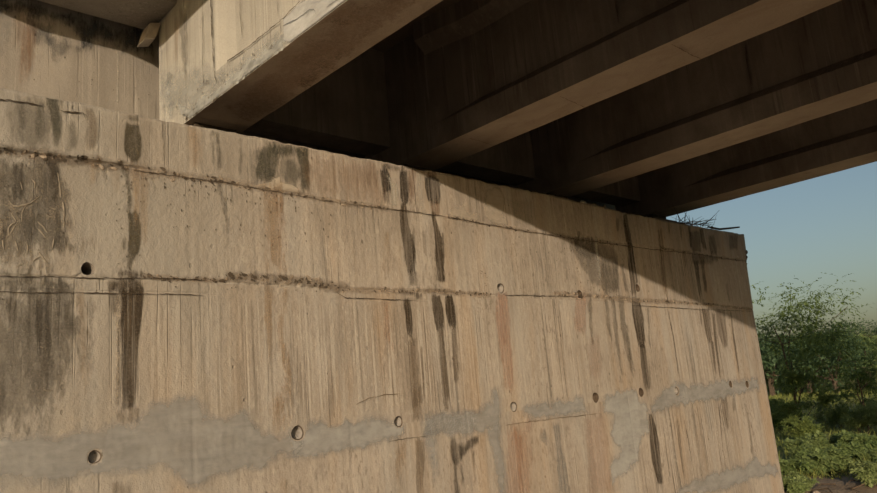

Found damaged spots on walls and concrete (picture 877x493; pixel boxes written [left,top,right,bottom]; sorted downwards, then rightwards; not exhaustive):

damp [124,123,141,161]
damp [256,144,309,188]
damp [425,176,445,282]
damp [623,215,637,288]
damp [109,187,143,408]
damp [404,299,412,337]
damp [432,295,456,403]
damp [632,298,650,387]
damp [451,438,479,493]
damp [649,415,662,483]